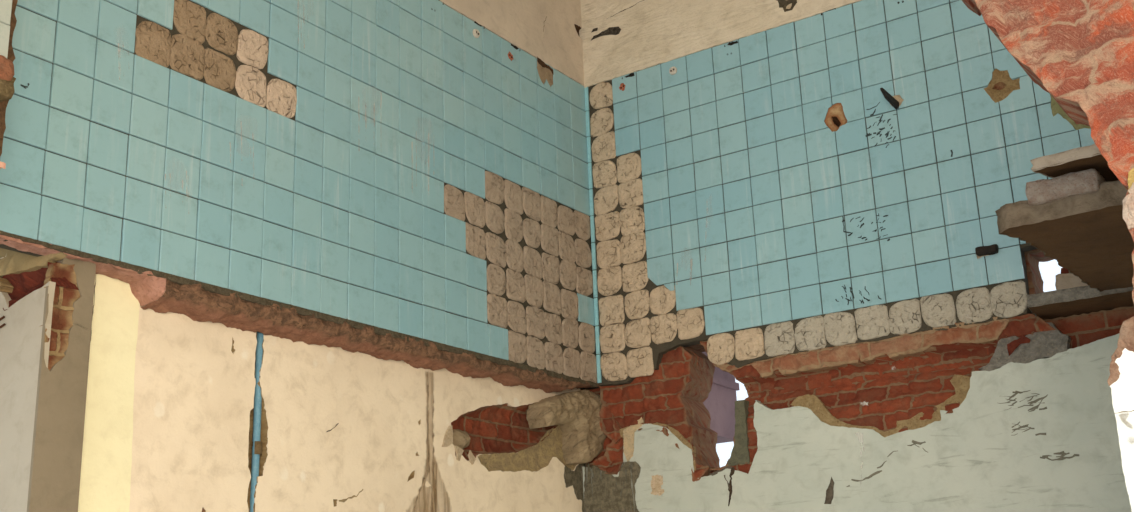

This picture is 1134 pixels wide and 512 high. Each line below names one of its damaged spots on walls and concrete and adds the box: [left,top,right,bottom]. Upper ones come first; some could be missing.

spalling [7,0,18,62]
peeling [135,0,297,118]
spalling [536,57,554,87]
spalling [984,69,1020,103]
spalling [0,100,9,156]
peeling [0,171,597,393]
flaking render [442,82,1134,512]